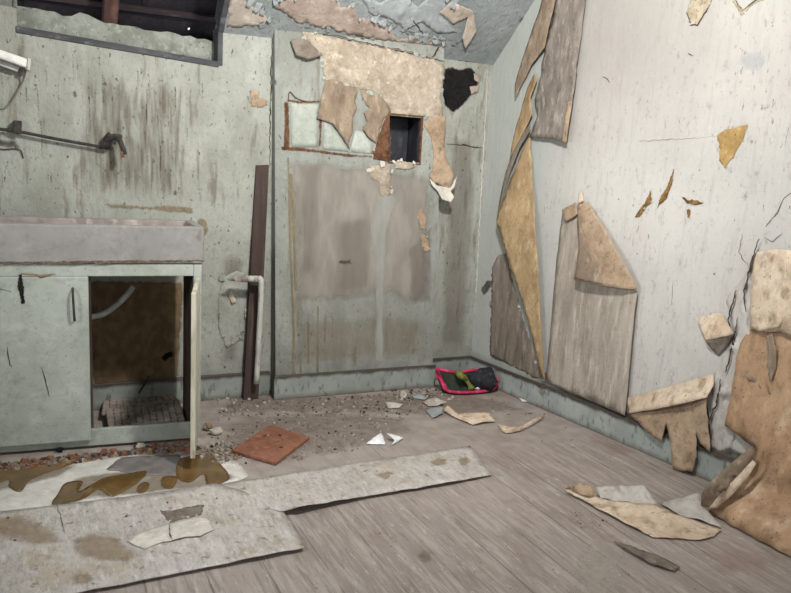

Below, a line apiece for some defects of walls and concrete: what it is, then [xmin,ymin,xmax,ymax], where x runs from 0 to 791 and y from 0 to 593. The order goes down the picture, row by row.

crack [323,34,470,62]
corrosion [281,100,392,162]
flaking render [227,0,480,202]
peeling [717,124,748,168]
crack [452,70,488,314]
peeling [490,254,545,382]
water stain [106,455,181,476]